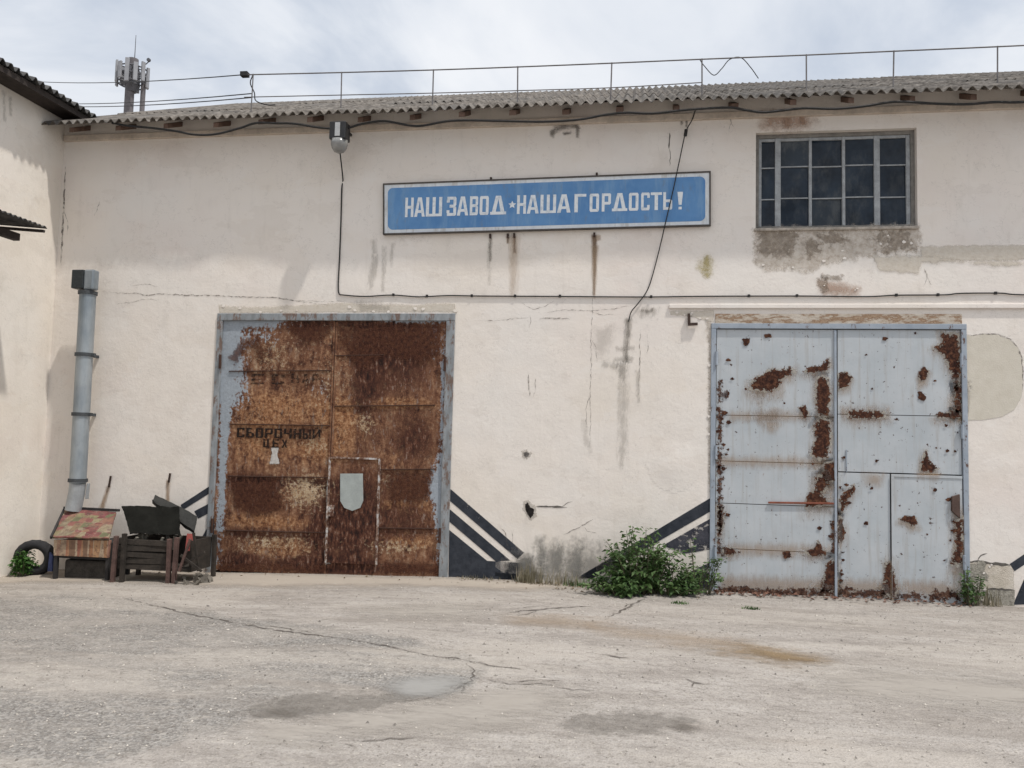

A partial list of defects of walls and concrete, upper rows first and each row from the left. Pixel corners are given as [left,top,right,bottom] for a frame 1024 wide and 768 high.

flaking render [754,229,955,274]
rust [934,332,962,433]
spalling [523,500,537,520]
rust [715,358,964,601]